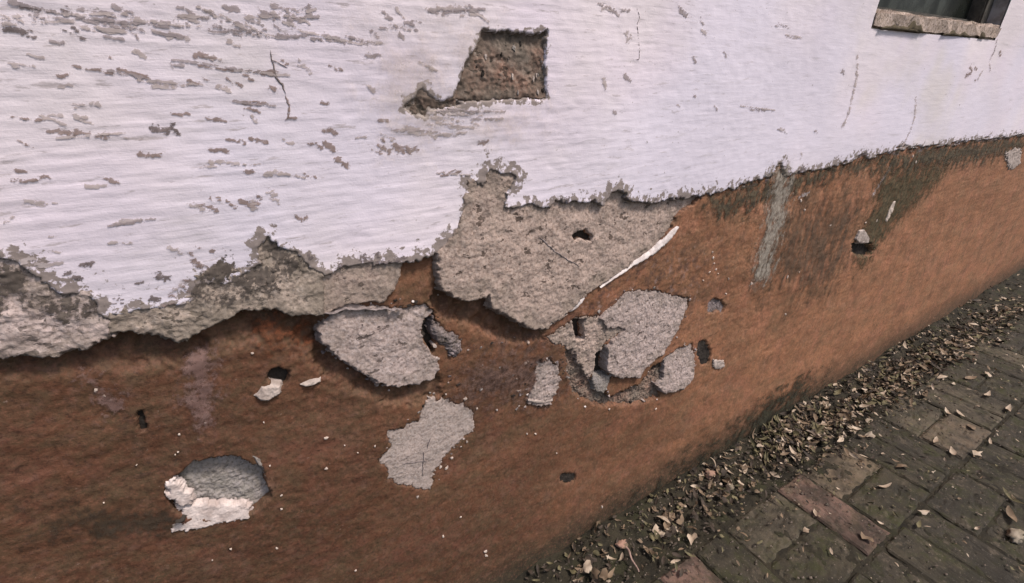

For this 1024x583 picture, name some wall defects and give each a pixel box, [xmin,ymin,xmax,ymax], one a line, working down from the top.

crack [270,50,290,120]
flaking render [403,31,546,117]
peeling [0,236,402,359]
peeling [424,169,699,410]
hole [254,367,288,401]
peeling [378,375,474,498]
flaking render [164,455,269,533]